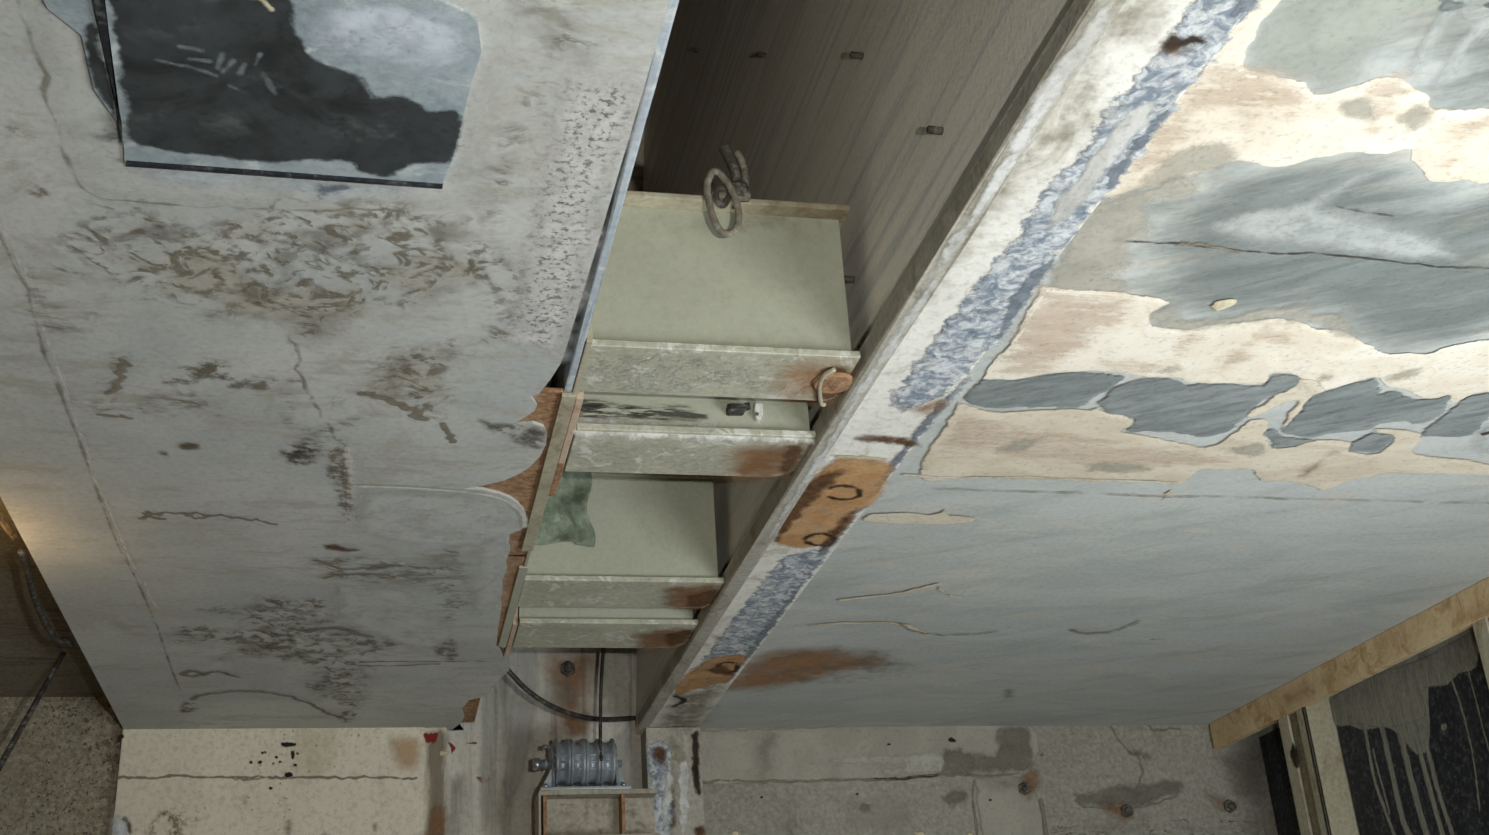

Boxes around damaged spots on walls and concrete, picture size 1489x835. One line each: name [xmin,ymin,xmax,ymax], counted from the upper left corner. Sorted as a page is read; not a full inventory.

damp [73,205,504,334]
peeling [884,0,1489,501]
crack [1126,241,1489,269]
rust [739,446,802,476]
rust [775,436,918,548]
damp [313,552,464,608]
damp [178,600,396,722]
rust [675,652,872,696]